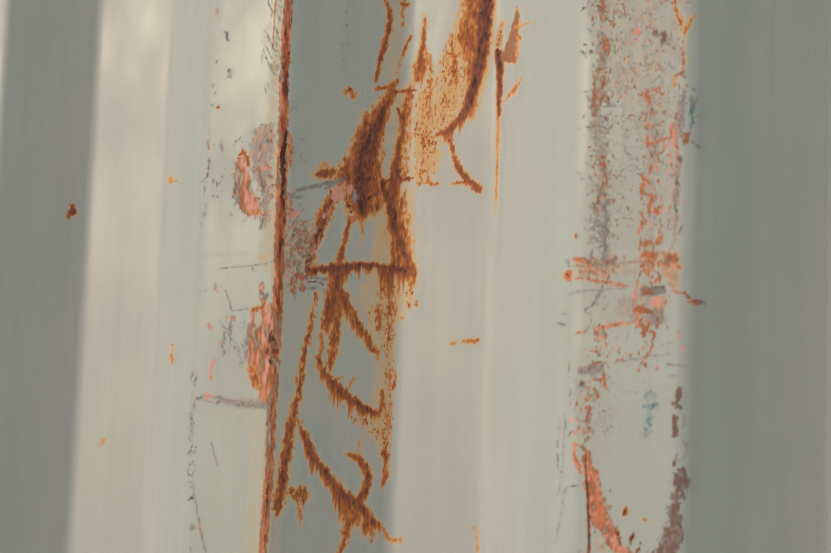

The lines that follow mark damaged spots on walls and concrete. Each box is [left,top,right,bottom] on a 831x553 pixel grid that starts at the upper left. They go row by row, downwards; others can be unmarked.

corrosion [63,198,84,224]
peeling [198,0,311,553]
corrosion [270,0,526,553]
peeling [570,0,705,375]
peeling [563,403,655,553]